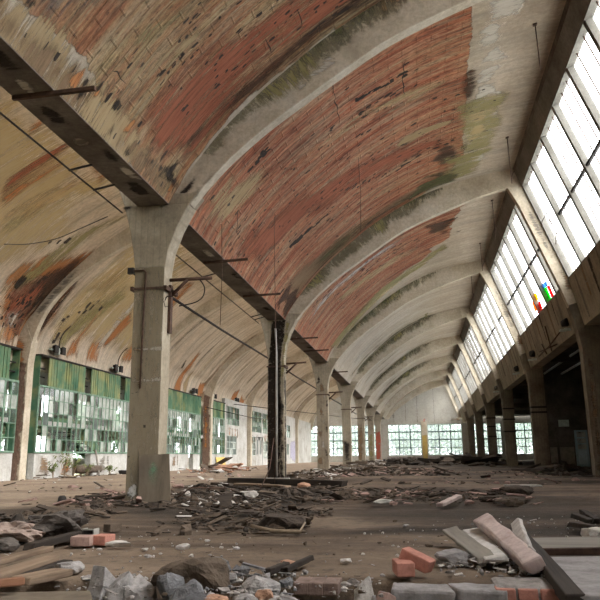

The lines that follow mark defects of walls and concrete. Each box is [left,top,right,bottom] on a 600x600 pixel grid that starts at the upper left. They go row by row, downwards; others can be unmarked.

flaking render [17,0,381,203]
leakage [204,0,406,155]
flaking render [189,0,523,319]
flaking render [295,205,464,361]
leakage [300,94,507,296]